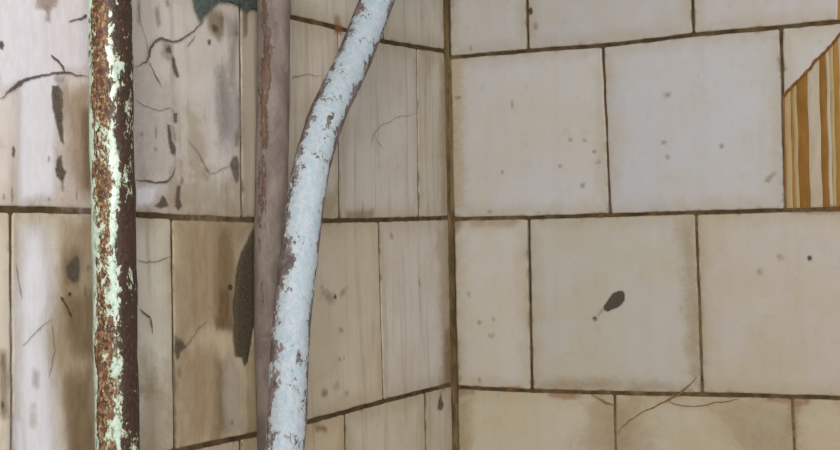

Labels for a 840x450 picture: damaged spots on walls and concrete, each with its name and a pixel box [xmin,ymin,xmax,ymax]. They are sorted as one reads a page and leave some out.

peeling [193,0,257,34]
crack [0,54,88,99]
crack [133,24,201,87]
corrosion [255,0,277,228]
crack [137,167,176,183]
peeling [265,0,395,450]
crack [619,377,738,432]